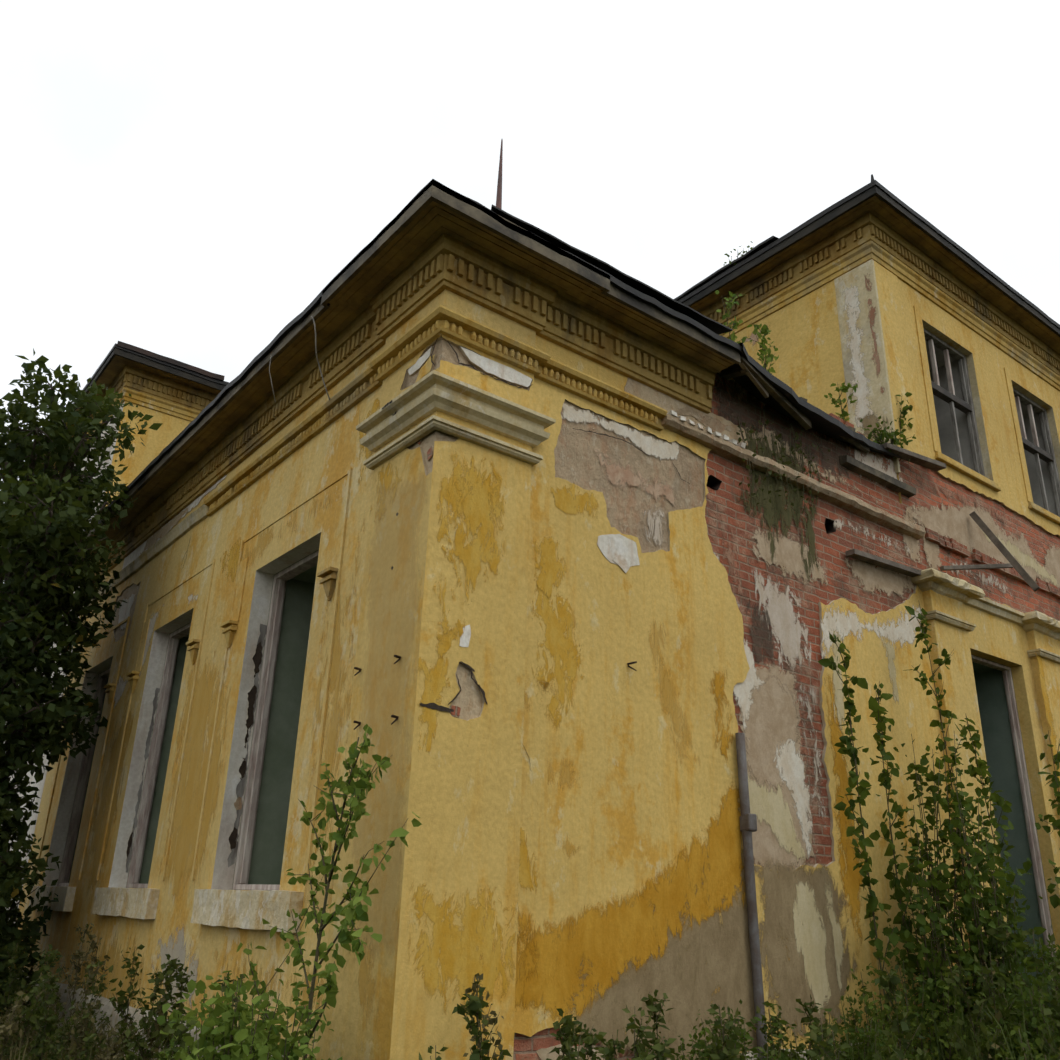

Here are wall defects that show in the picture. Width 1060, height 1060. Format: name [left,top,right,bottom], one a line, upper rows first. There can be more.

flaking render [400,336,533,391]
peeling [459,625,471,647]
flaking render [554,372,1060,869]
peeling [239,642,262,779]
flaking render [420,661,487,721]
peeling [228,827,238,849]